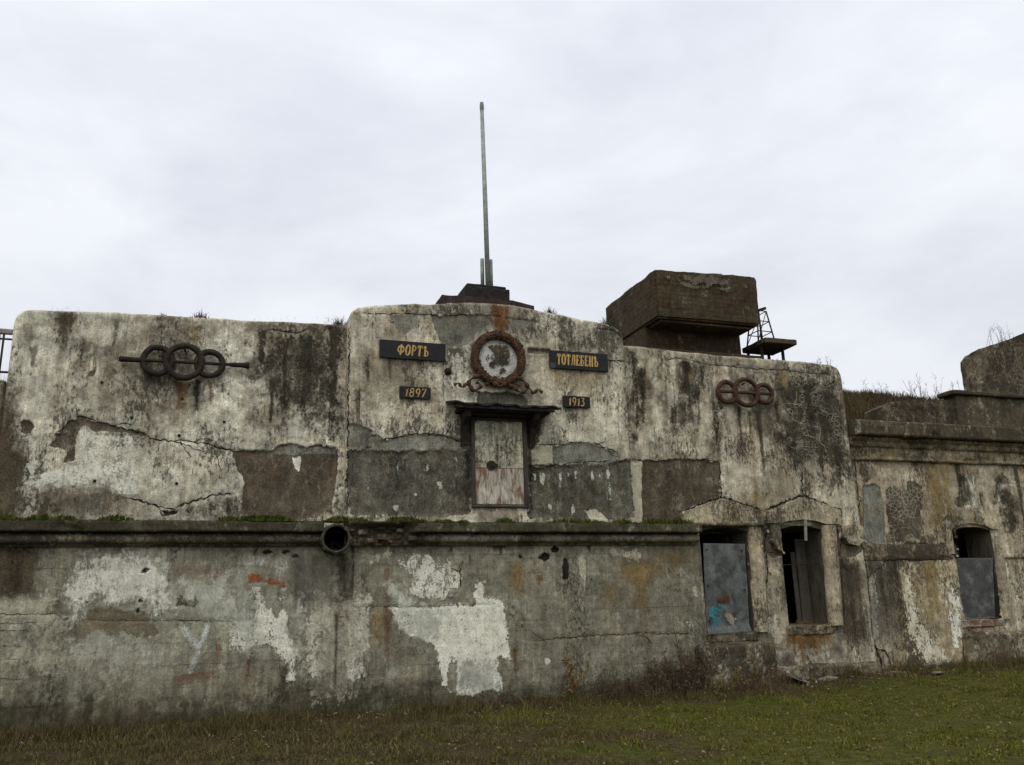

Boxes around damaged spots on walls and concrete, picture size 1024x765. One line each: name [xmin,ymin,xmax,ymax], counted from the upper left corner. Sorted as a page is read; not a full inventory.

crack [58,491,234,516]
crack [52,408,241,467]
water stain [244,324,360,440]
spalling [233,423,471,521]
spalling [538,546,569,580]
crack [529,356,917,667]
water stain [738,367,856,484]
peeling [0,546,511,697]